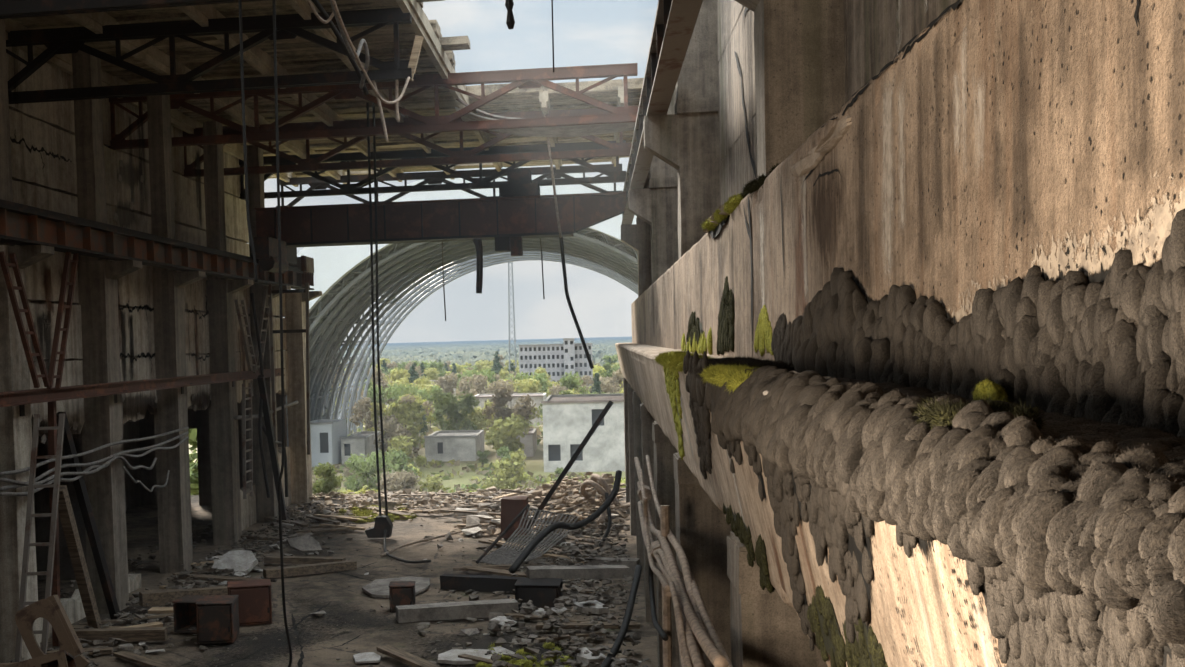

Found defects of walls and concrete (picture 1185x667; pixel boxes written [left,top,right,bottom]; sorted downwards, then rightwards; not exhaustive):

crack [809,0,960,136]
crack [1132,0,1140,27]
damp [948,166,1185,323]
damp [896,597,932,667]
damp [949,554,1006,667]